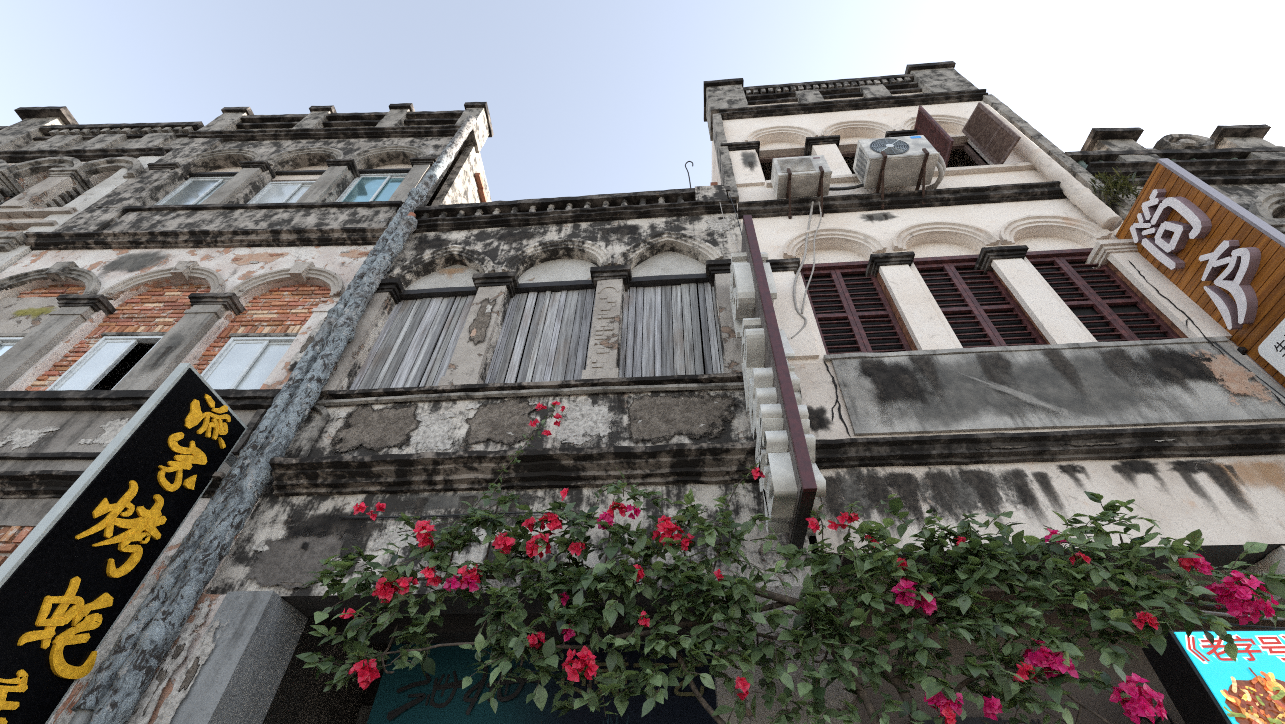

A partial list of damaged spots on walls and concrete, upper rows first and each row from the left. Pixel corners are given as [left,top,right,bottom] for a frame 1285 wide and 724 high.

water stain [412,237,453,257]
water stain [495,231,534,245]
water stain [598,224,640,241]
water stain [855,347,1227,425]
peeling [1188,349,1280,406]
peeling [0,426,61,450]
peeling [78,415,129,447]
spalling [330,390,736,453]
water stain [821,464,1086,530]
water stain [1112,459,1246,508]
peeling [50,555,173,724]
peeling [127,578,230,724]